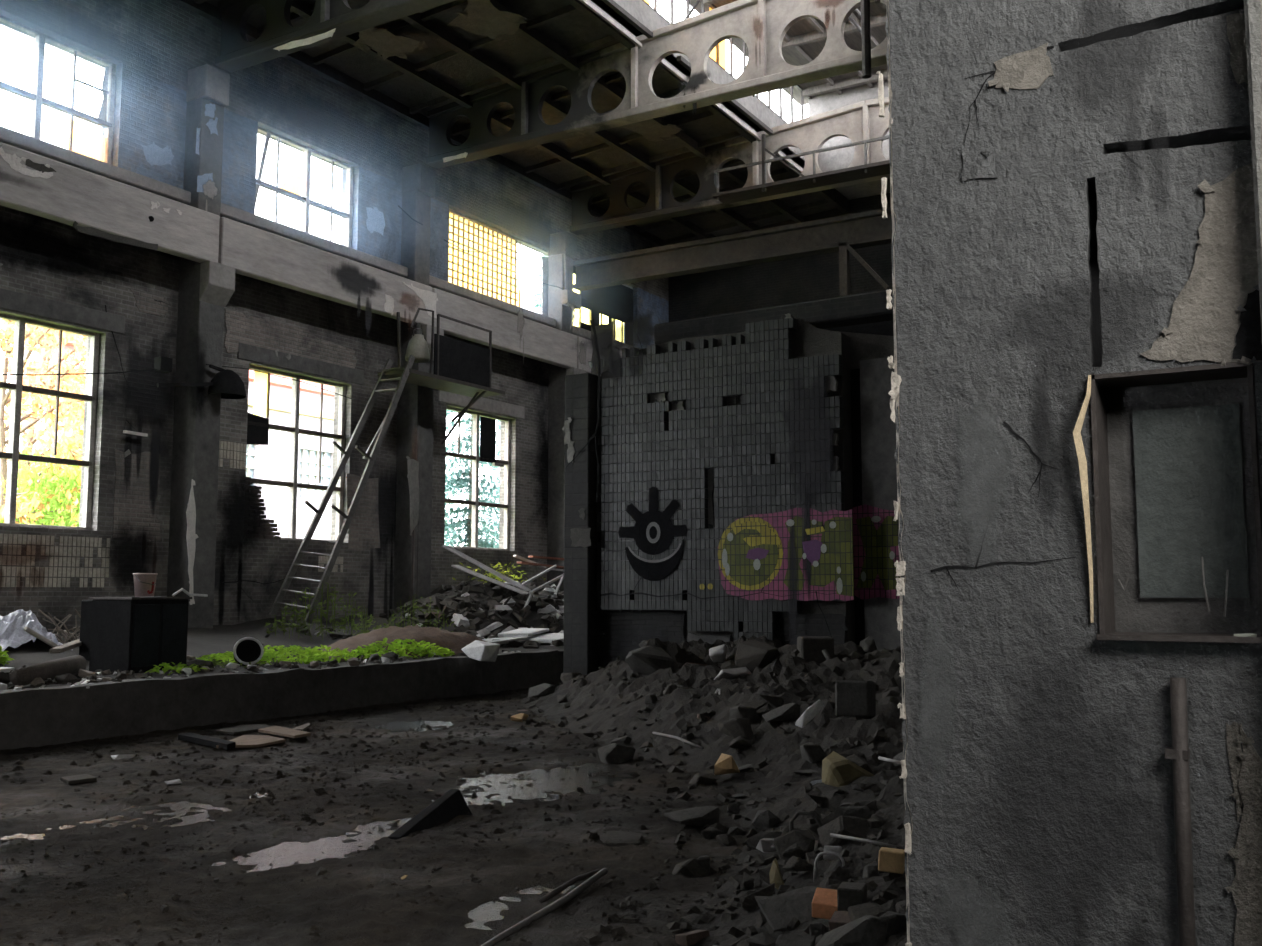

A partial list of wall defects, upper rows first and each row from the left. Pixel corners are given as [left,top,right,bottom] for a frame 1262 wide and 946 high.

peeling [0,147,56,179]
water stain [336,264,379,334]
peeling [588,321,614,375]